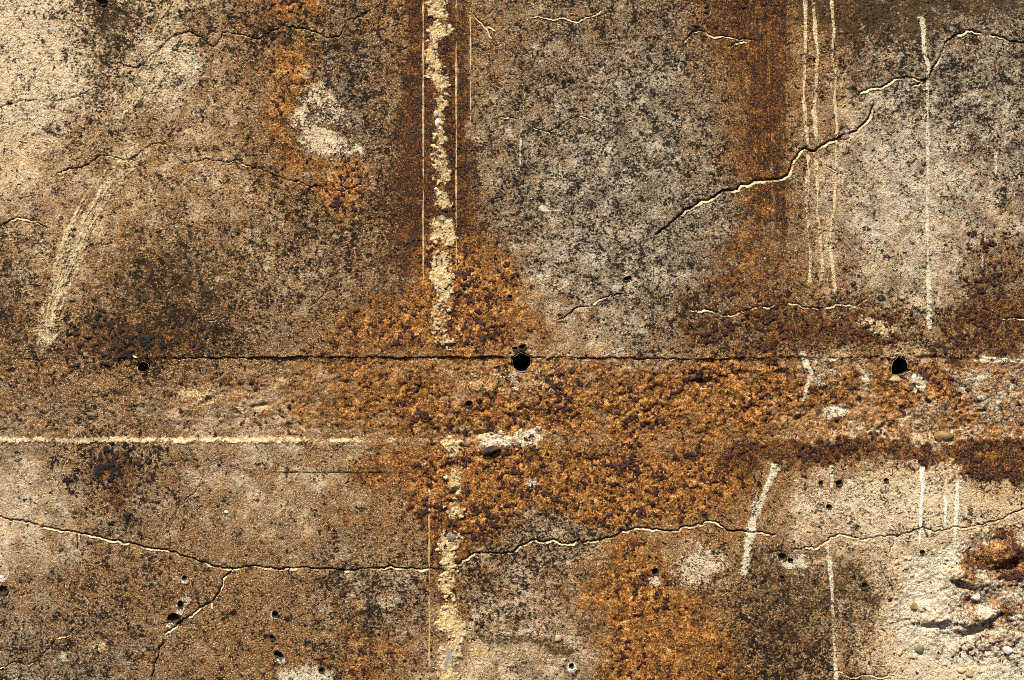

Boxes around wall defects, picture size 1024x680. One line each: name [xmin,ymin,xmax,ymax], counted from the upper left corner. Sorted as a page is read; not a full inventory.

crack [559,29,1024,321]
damp [787,0,1024,331]
rust [169,365,282,431]
crack [179,354,501,362]
rust [256,0,1024,680]
crack [0,469,1024,679]
damp [732,463,896,680]